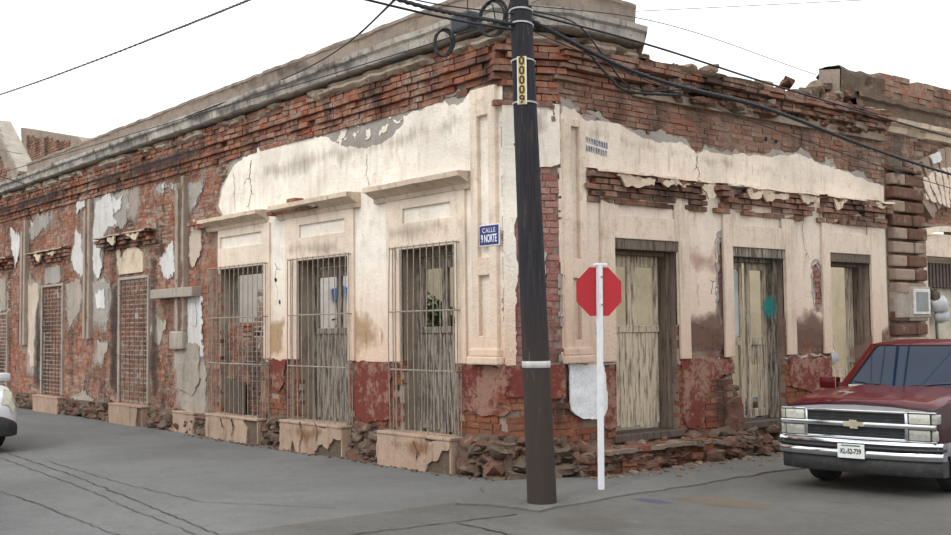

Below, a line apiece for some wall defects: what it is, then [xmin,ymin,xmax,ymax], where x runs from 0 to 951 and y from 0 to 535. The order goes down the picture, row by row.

flaking render [334,117,404,146]
flaking render [550,71,885,185]
peeling [616,173,716,199]
peeling [746,187,820,205]
flaking render [0,161,229,414]
flaking render [514,218,522,362]
flaking render [540,168,565,361]
flaking render [258,289,305,416]
flaking render [350,360,409,429]
flaking render [459,409,510,440]
flaking render [672,327,734,432]
flaking render [779,340,832,405]